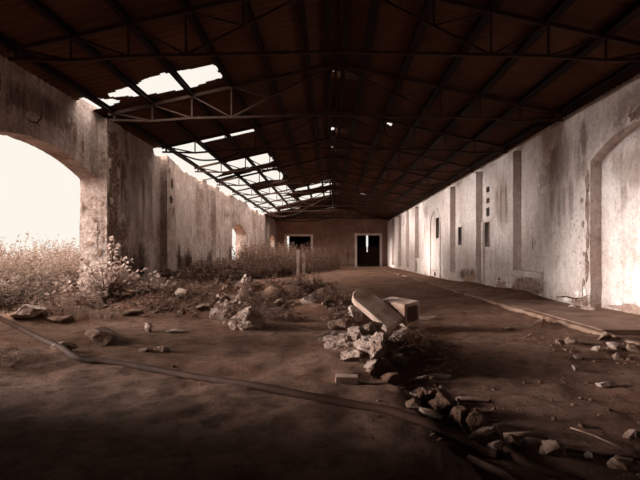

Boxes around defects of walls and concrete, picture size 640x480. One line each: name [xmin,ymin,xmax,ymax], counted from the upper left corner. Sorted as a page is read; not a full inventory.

spalling [564,170,590,307]